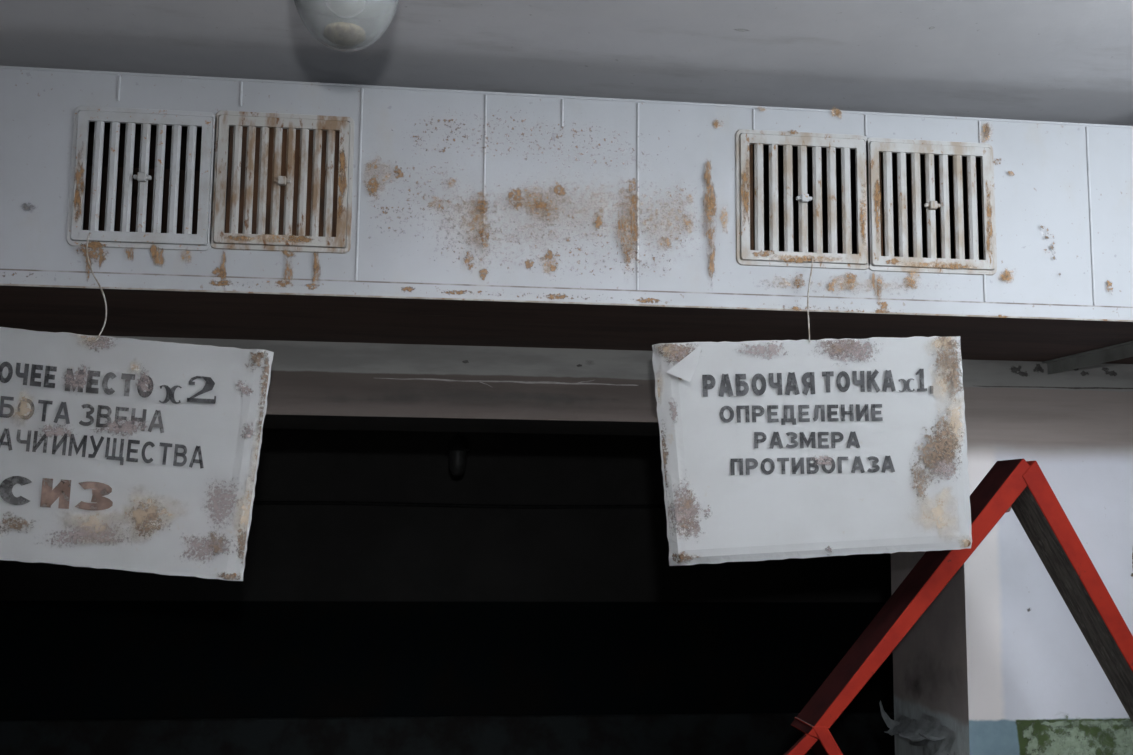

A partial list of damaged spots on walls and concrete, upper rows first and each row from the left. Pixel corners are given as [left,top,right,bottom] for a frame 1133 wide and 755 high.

rust [365,112,728,296]
rust [741,160,750,223]
rust [860,180,881,238]
rust [76,241,108,279]
rust [150,244,164,265]
rust [209,234,320,290]
rust [753,250,838,288]
rust [828,258,899,313]
rust [900,262,968,289]
peeling [1023,716,1133,755]